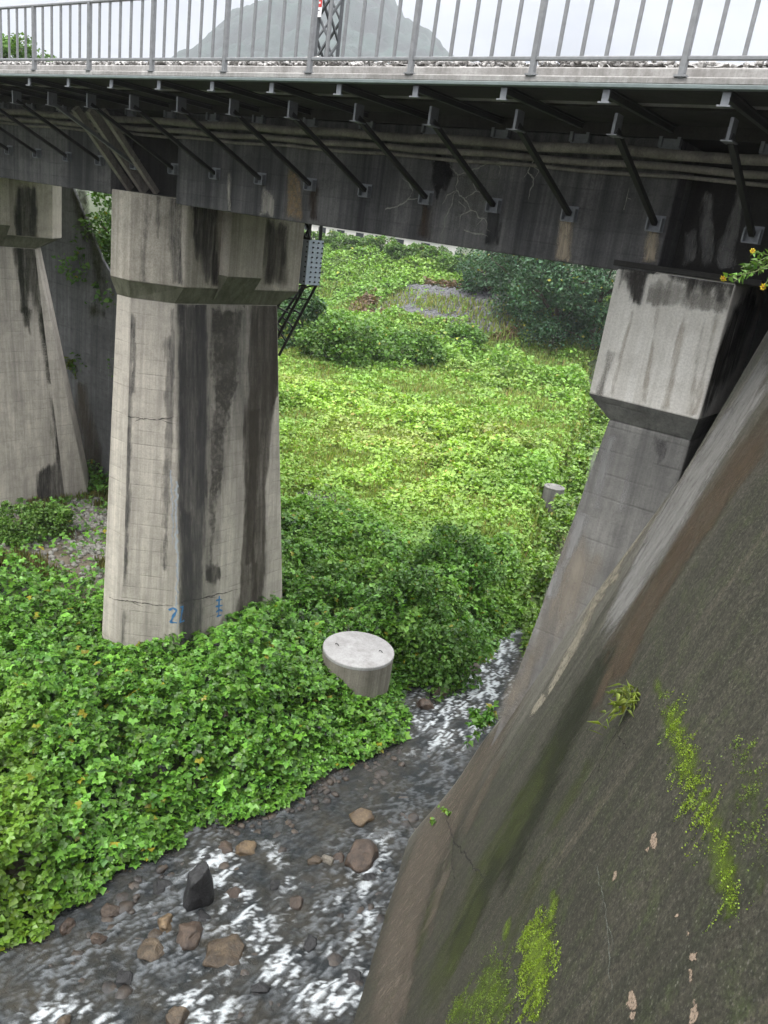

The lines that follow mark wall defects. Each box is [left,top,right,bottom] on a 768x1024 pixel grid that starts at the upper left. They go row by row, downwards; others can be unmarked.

leakage [15,188,47,347]
leakage [193,207,218,284]
crack [442,161,539,237]
leakage [621,232,756,412]
leakage [164,304,207,651]
leakage [239,306,278,612]
crack [109,589,238,606]
leakage [374,705,520,1024]
spalling [626,990,636,1019]